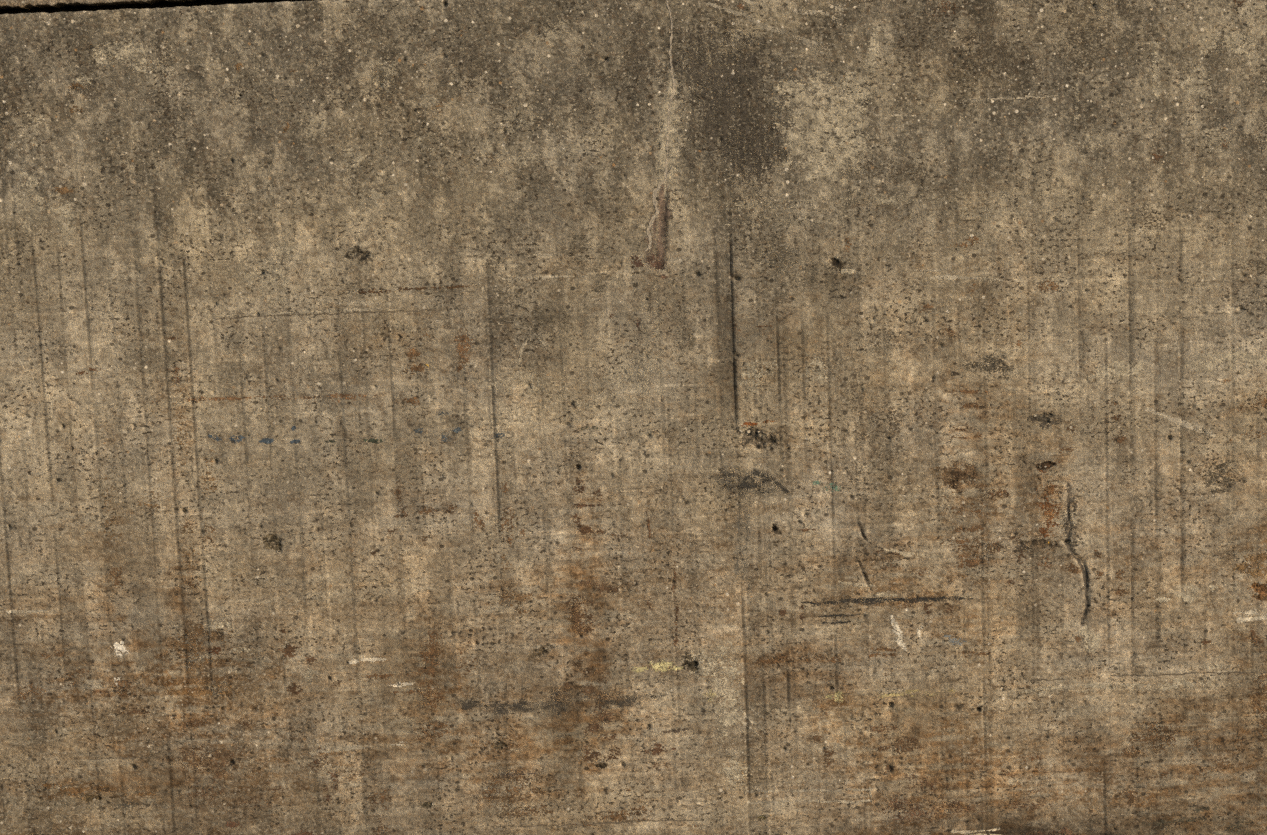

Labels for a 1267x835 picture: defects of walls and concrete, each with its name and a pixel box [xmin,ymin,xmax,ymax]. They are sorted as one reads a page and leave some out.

water stain [150,24,189,138]
water stain [297,28,405,119]
water stain [893,5,1034,98]
water stain [1043,0,1163,73]
crack [635,0,676,262]
water stain [849,157,927,181]
water stain [483,279,573,342]
corrosion [631,254,667,279]
water stain [547,15,861,443]
crack [1064,507,1089,621]